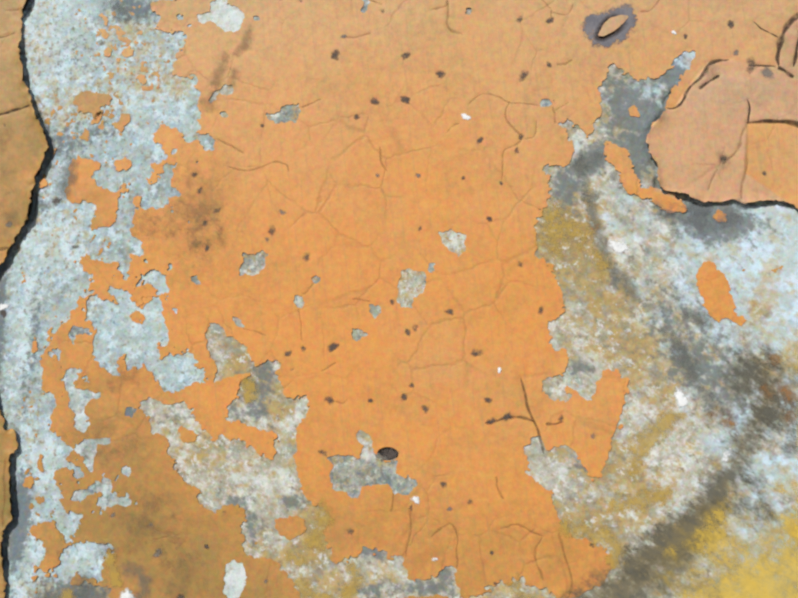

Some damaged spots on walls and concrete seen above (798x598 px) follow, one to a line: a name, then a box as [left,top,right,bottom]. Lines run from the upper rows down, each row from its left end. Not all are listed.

crack [749,13,798,77]
crack [666,59,727,109]
crack [747,101,798,127]
peeling [0,0,563,598]
peeling [524,51,798,598]
crack [487,380,562,450]
leakage [572,349,798,598]